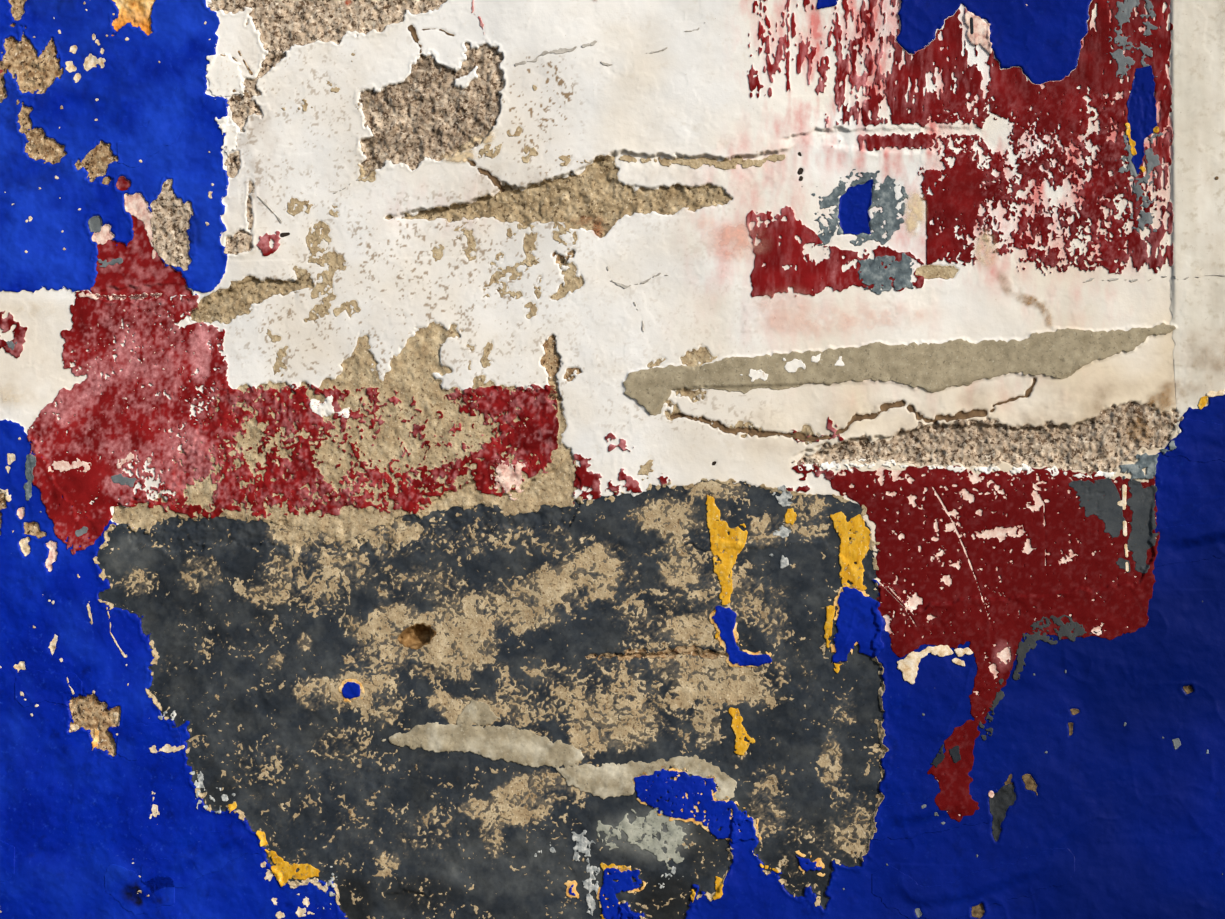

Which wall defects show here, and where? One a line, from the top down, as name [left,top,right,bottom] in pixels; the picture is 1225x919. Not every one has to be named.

peeling [0,0,156,185]
spalling [204,0,447,256]
spalling [356,42,538,182]
peeling [746,0,1174,298]
peeling [0,311,27,358]
peeling [0,489,11,535]
peeling [17,152,1184,919]